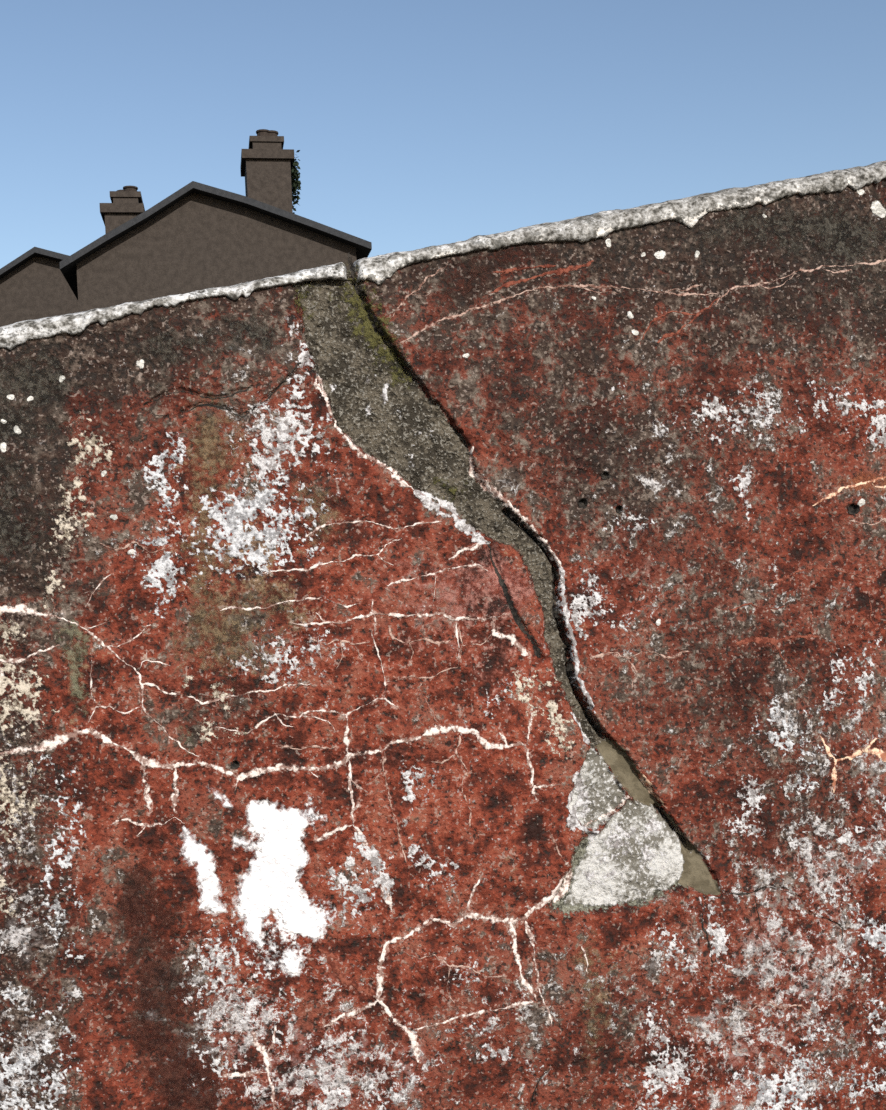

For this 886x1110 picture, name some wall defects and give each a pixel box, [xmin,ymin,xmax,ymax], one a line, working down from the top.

leakage [182,417,251,654]
crack [0,253,886,1062]
leakage [182,801,335,976]